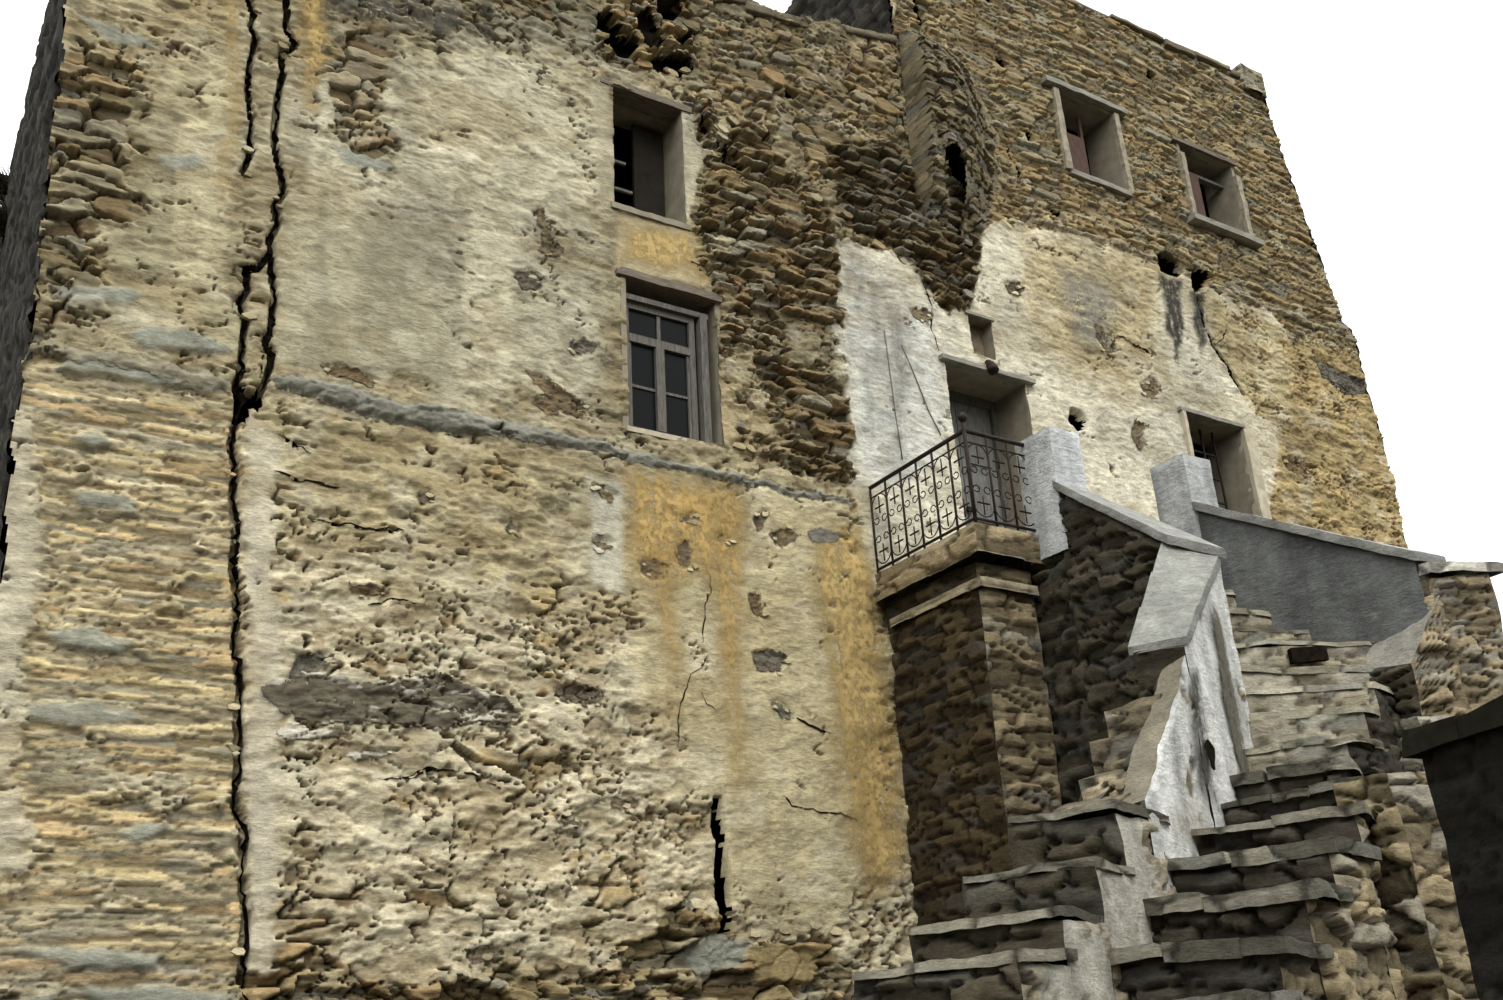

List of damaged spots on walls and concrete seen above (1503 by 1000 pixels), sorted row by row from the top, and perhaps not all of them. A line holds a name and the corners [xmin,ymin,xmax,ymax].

flaking render [594,0,982,480]
water stain [1160,275,1206,357]
crack [226,0,300,1000]
crack [275,434,403,533]
spalling [285,652,336,684]